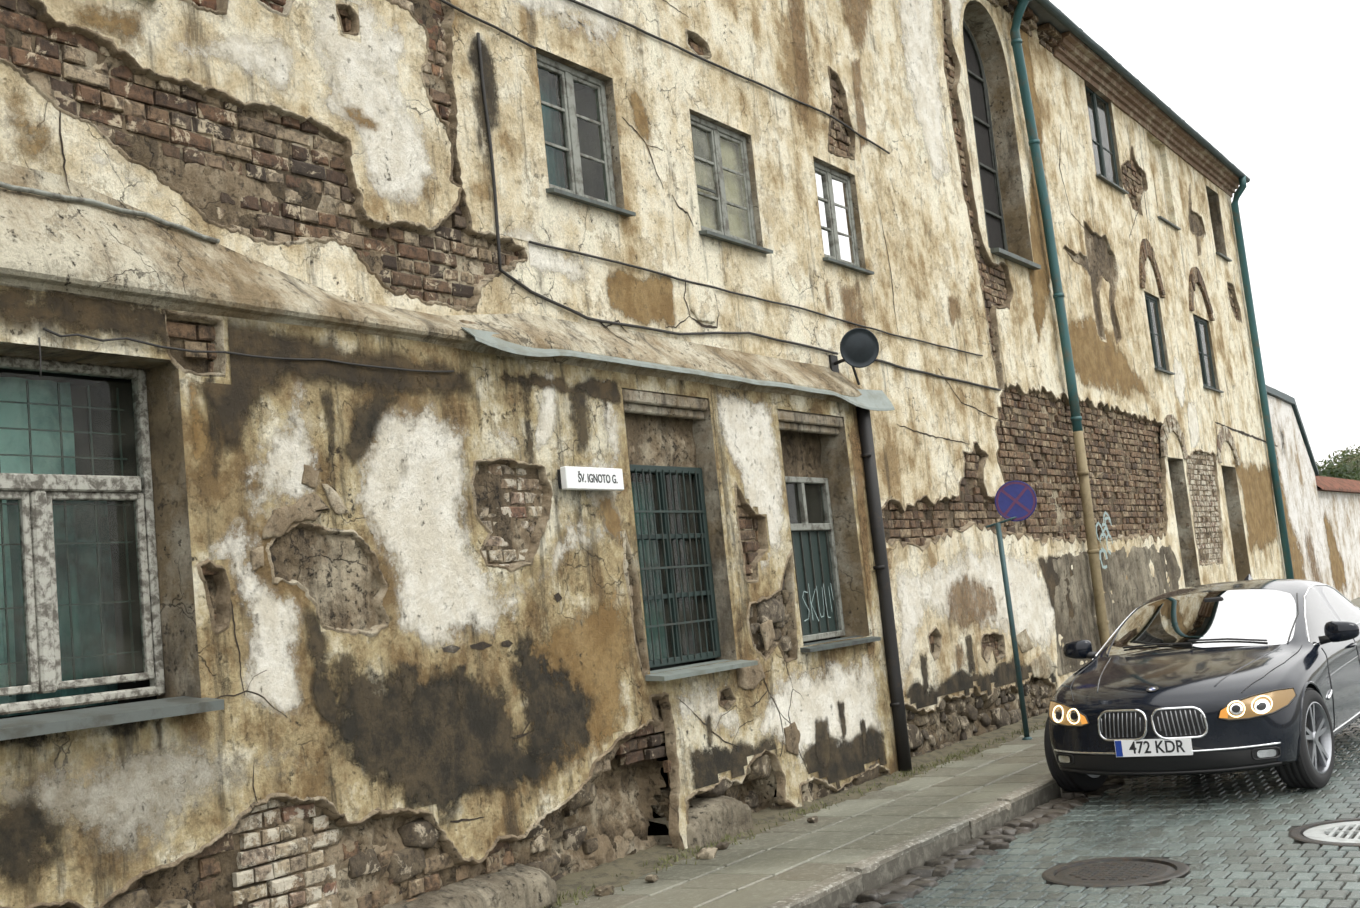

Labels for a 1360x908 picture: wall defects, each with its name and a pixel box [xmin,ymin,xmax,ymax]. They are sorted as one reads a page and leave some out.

flaking render [0,0,528,324]
water stain [468,37,500,166]
flaking render [828,66,856,160]
flaking render [881,0,1224,566]
crack [216,598,287,717]
flaking render [250,464,389,637]
flaking render [0,692,891,908]
water stain [306,589,628,823]
flaking render [470,457,553,573]
crack [679,663,809,773]
flaking render [718,482,798,711]
flaking render [904,626,1058,758]